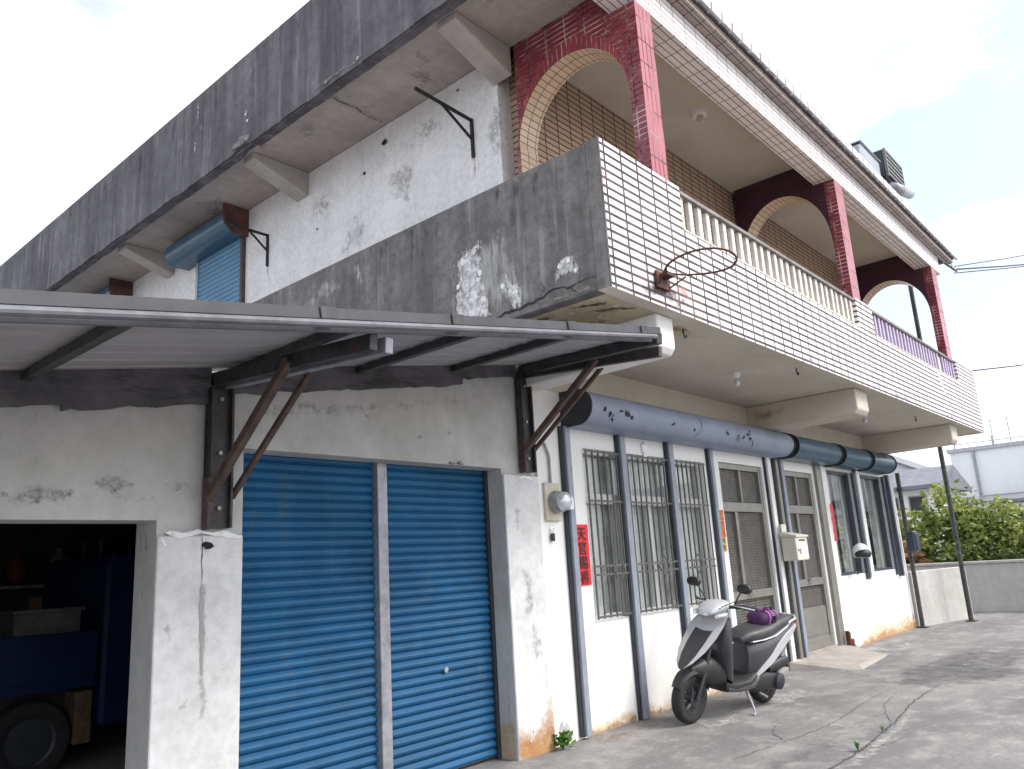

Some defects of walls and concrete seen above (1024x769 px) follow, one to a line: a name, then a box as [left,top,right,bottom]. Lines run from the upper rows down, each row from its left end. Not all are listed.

peeling [454,240,492,317]
peeling [501,271,522,309]
crack [496,276,594,318]
peeling [557,256,578,280]
crack [198,584,206,676]
rust [519,717,556,759]
crack [744,682,942,769]